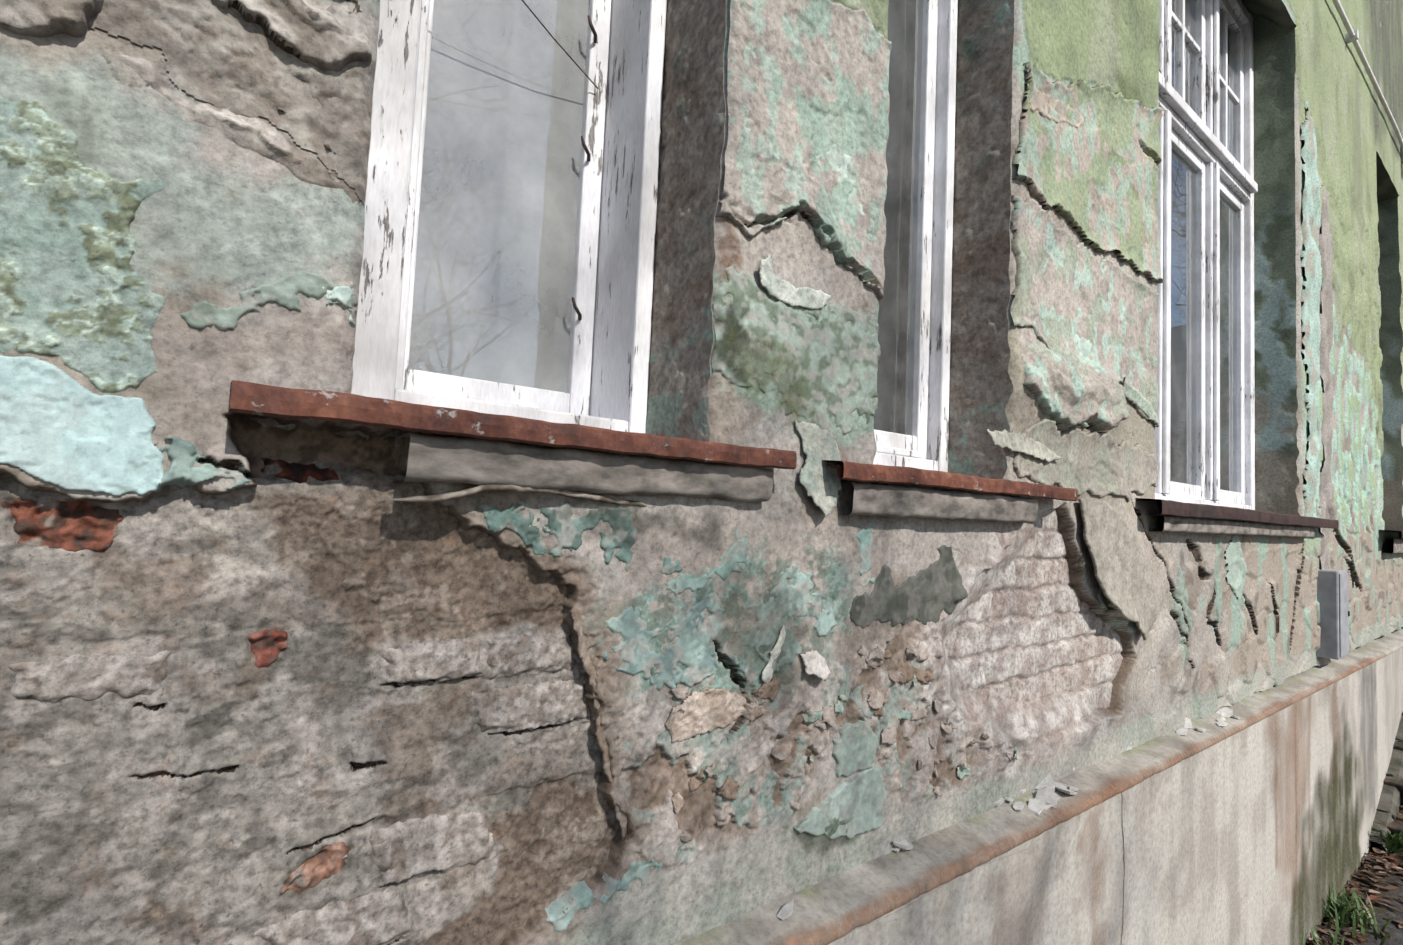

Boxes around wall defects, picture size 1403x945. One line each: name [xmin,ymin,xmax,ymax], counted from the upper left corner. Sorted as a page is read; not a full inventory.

flaking render [0,62,1163,945]
peeling [716,0,892,301]
peeling [1224,535,1248,599]
peeling [1300,101,1322,527]